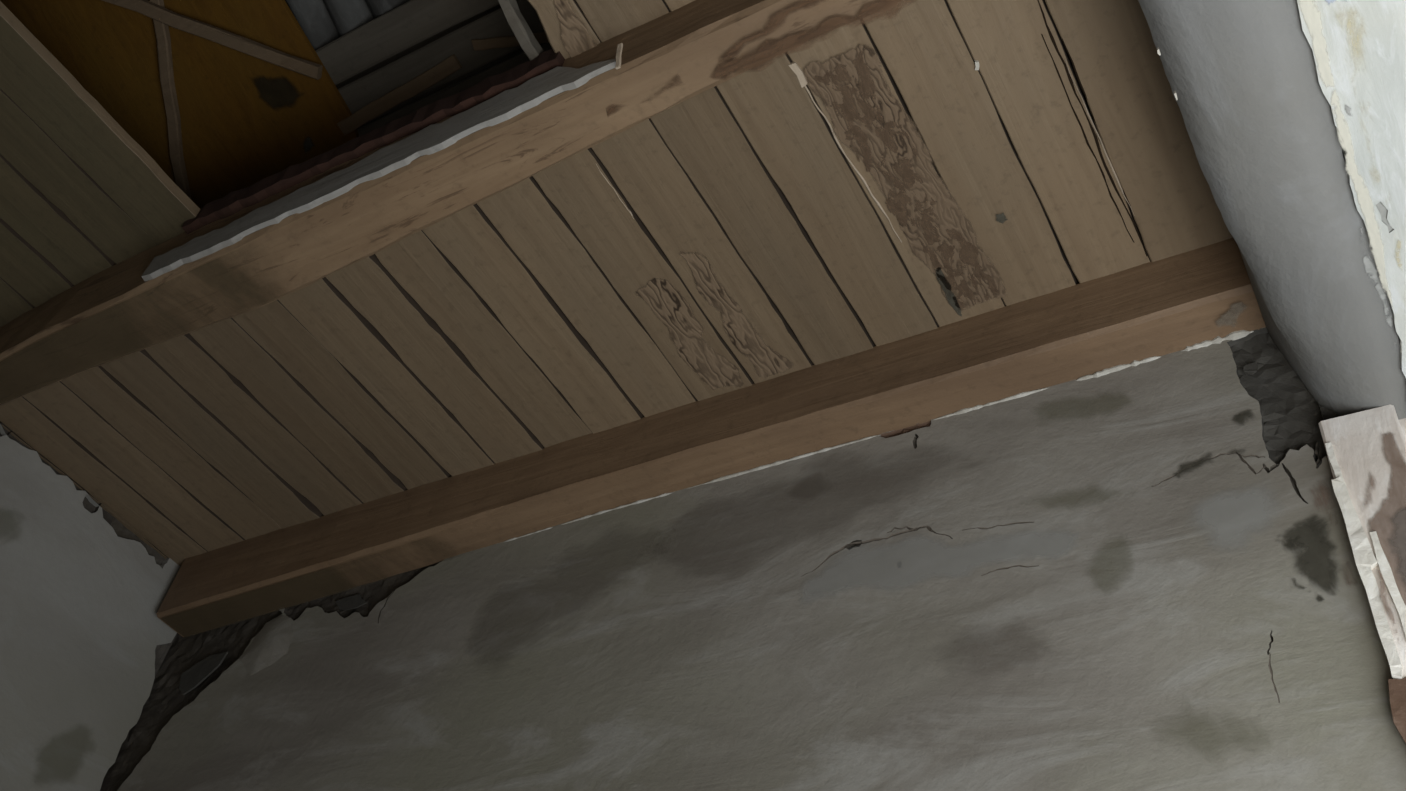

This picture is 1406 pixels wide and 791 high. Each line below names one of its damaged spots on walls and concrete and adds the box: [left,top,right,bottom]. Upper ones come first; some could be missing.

peeling [1299,0,1394,304]
spalling [1227,328,1340,504]
crack [1152,451,1266,487]
spalling [75,485,165,565]
crack [801,522,1039,577]
damp [1284,516,1336,601]
spalling [100,562,440,791]
crack [1267,630,1280,703]
flaking render [1388,677,1406,744]